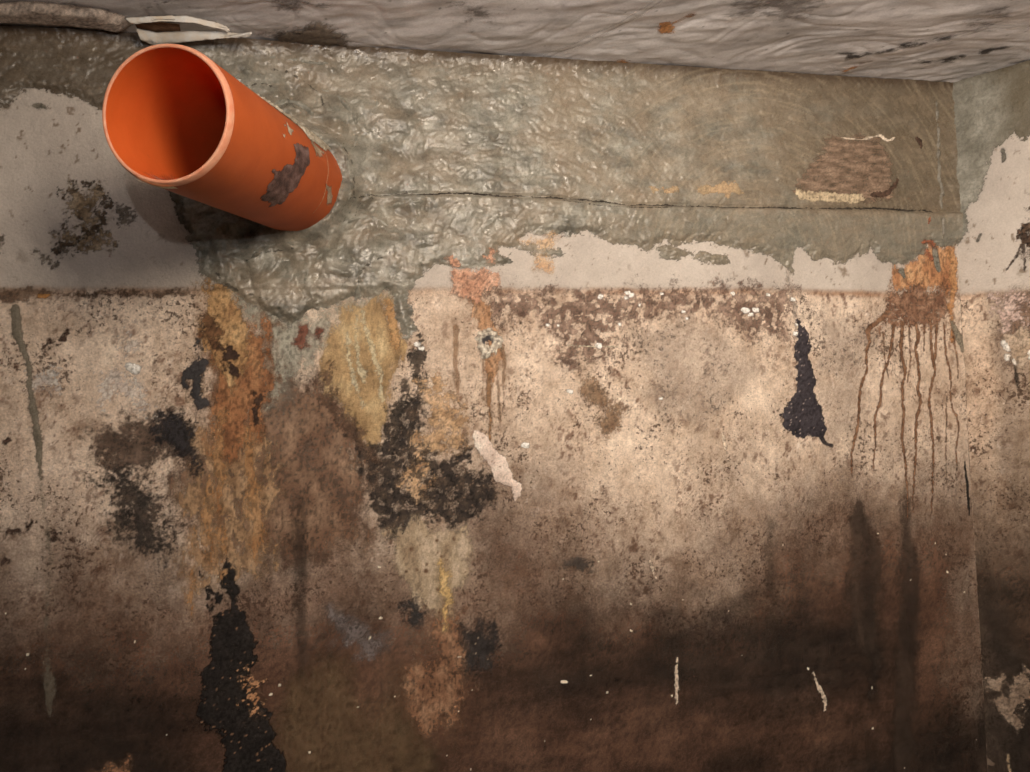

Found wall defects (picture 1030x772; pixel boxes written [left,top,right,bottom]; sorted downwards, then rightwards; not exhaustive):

corrosion [167,277,384,620]
crack [246,68,324,108]
damp [0,286,1030,772]
crack [336,138,931,218]
corrosion [850,239,960,519]
flaking render [1006,222,1030,270]